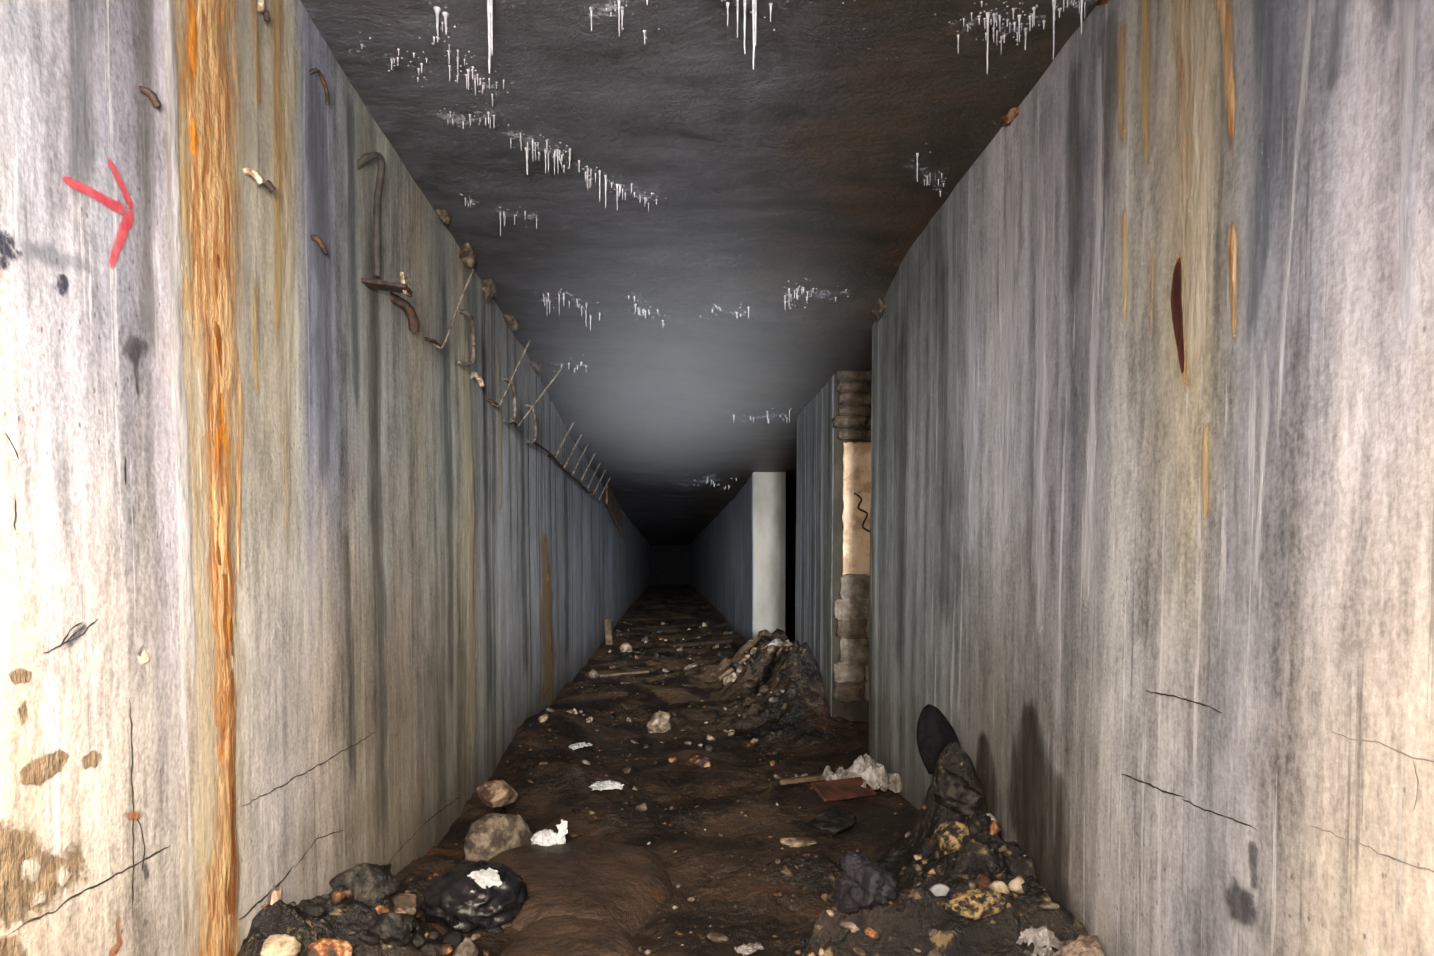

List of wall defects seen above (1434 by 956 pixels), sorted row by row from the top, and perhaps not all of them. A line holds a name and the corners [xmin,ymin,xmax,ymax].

leakage [935,0,1097,73]
leakage [385,0,667,212]
corrosion [1176,0,1235,368]
leakage [535,289,606,331]
corrosion [1228,224,1237,337]
corrosion [176,0,296,956]
peeling [9,668,31,684]
peeling [20,750,100,786]
crack [6,700,168,936]
crack [1122,774,1256,830]
peeling [0,821,87,956]
crack [239,830,343,920]